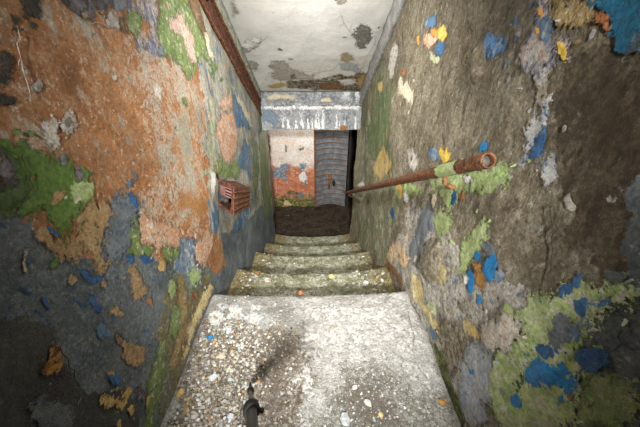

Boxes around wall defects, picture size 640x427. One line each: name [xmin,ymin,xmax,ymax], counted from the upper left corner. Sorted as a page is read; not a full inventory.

flaking render [10,0,42,32]
peeling [61,0,223,82]
flaking render [344,23,380,49]
peeling [482,0,640,83]
flaking render [0,50,17,106]
flaking render [151,71,162,104]
flaking render [267,58,366,92]
peeling [271,163,308,184]
peeling [0,85,259,374]
peeling [365,75,640,427]